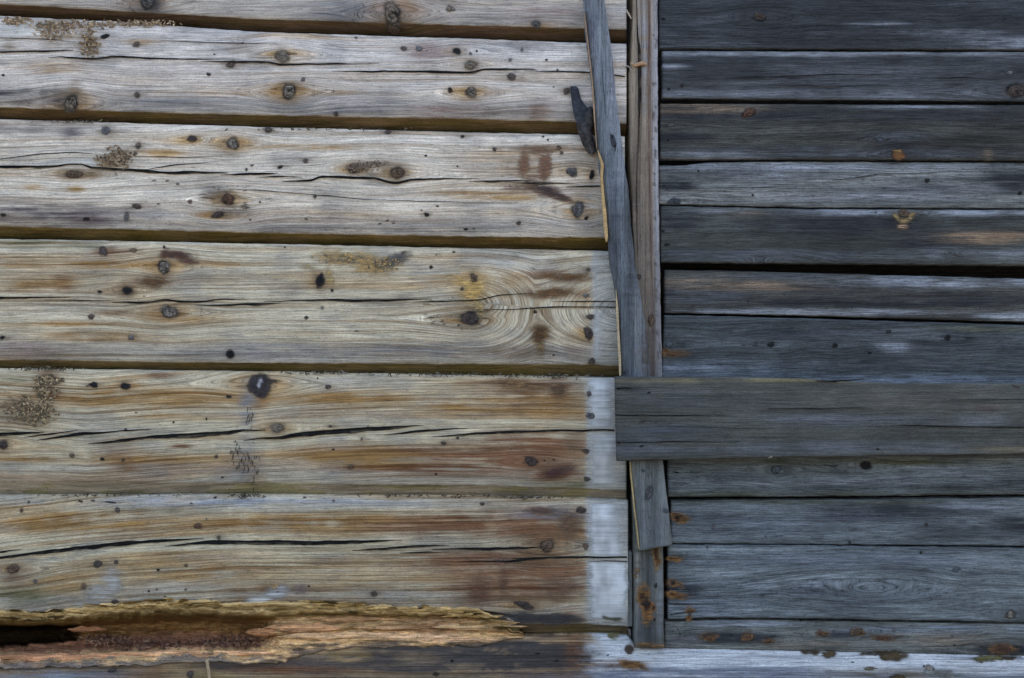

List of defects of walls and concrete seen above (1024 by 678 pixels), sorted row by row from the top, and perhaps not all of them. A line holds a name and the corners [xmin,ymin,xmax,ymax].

crack [0,0,642,213]
crack [0,414,725,444]
crack [0,538,627,562]
peeling [1,598,236,622]
peeling [305,600,401,615]
peeling [418,604,521,630]
rust [634,569,656,623]